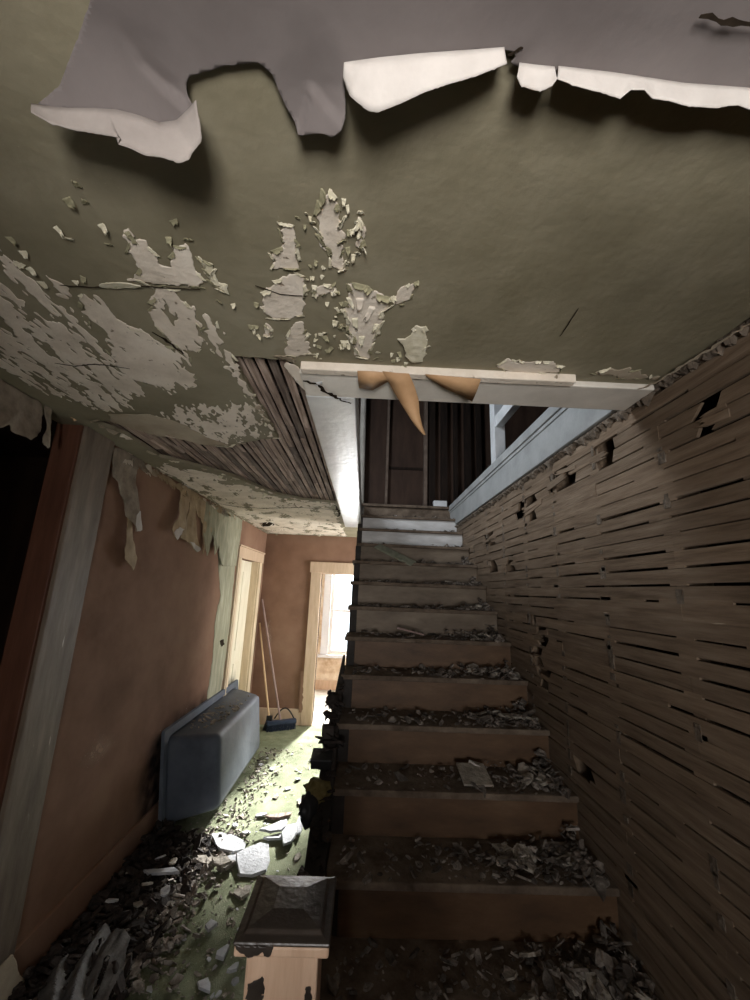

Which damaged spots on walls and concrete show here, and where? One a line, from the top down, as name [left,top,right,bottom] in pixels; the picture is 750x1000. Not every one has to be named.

peeling [248,188,431,390]
peeling [496,358,565,374]
peeling [589,367,660,380]
peeling [0,218,348,566]
crack [303,380,351,404]